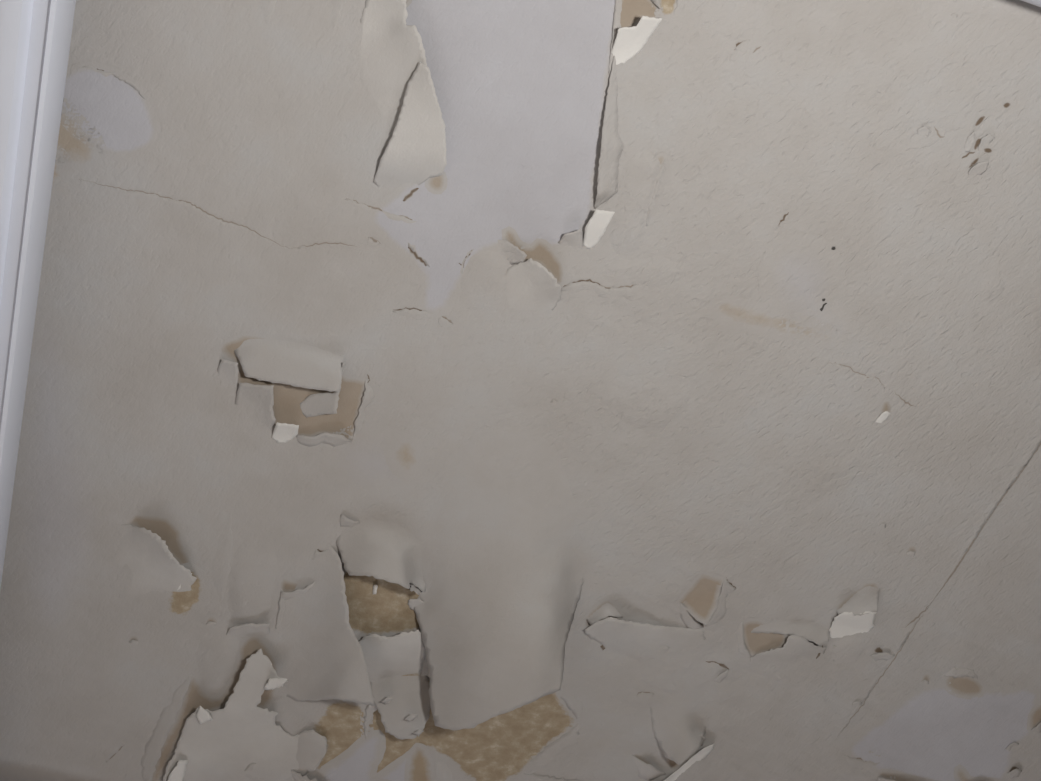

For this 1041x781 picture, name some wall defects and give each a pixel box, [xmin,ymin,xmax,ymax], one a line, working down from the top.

crack [345,198,430,268]
peeling [359,0,685,319]
peeling [962,115,995,176]
peeling [2,294,233,646]
peeling [217,332,375,447]
peeling [141,427,736,781]
peeling [736,579,895,667]
crack [835,435,1041,740]